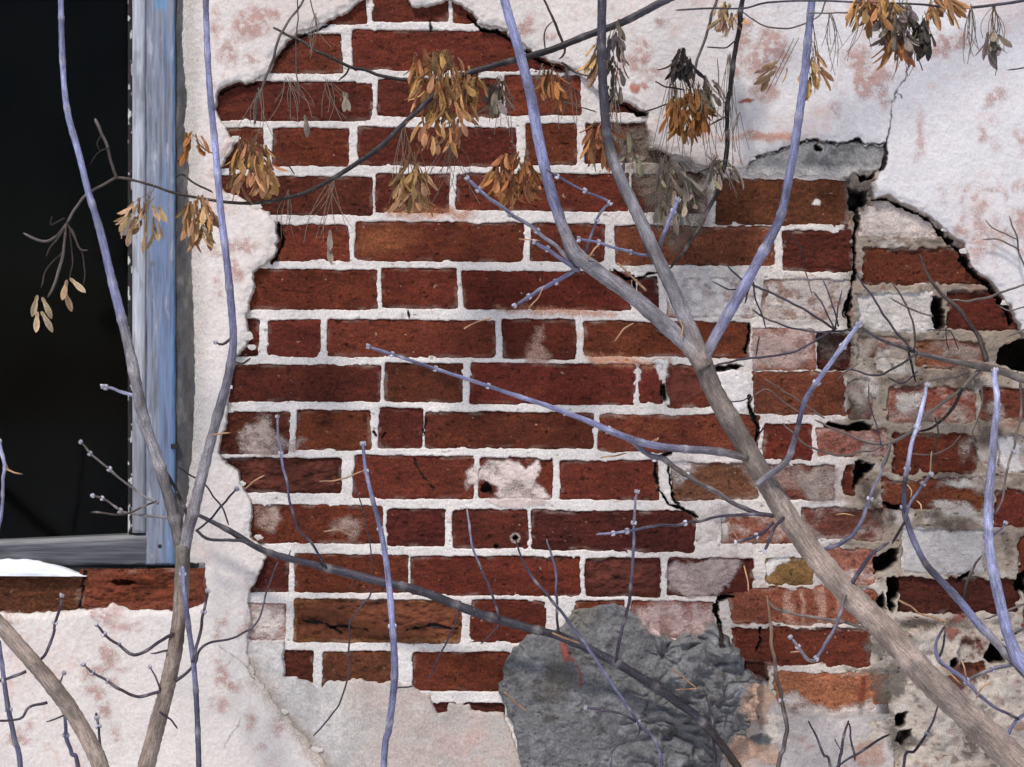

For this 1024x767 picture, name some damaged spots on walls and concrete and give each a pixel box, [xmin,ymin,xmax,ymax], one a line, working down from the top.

spalling [408,0,891,176]
crack [863,65,910,171]
spalling [847,170,1024,372]
crack [747,394,763,442]
peeling [466,459,551,510]
crack [653,452,698,518]
spalling [852,460,901,525]
spalling [216,377,339,767]
spalling [587,557,660,594]
spalling [872,548,898,612]
spalling [296,600,461,640]
spalling [946,613,1004,693]